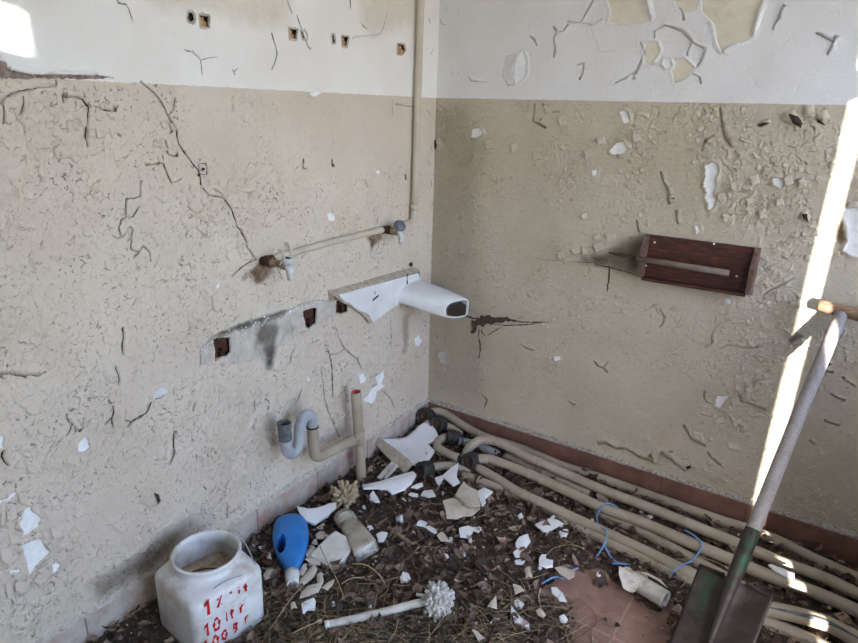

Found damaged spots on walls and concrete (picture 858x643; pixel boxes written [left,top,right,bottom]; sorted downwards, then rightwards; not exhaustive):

crack [530,0,601,81]
crack [615,7,713,87]
peeling [670,0,768,57]
crack [0,80,119,147]
crack [111,76,284,279]
peeling [606,138,632,159]
peeling [692,158,806,237]
spalling [201,295,372,367]
crack [105,325,168,432]
crack [297,324,366,437]
peeling [357,368,386,406]
peeling [0,487,64,605]